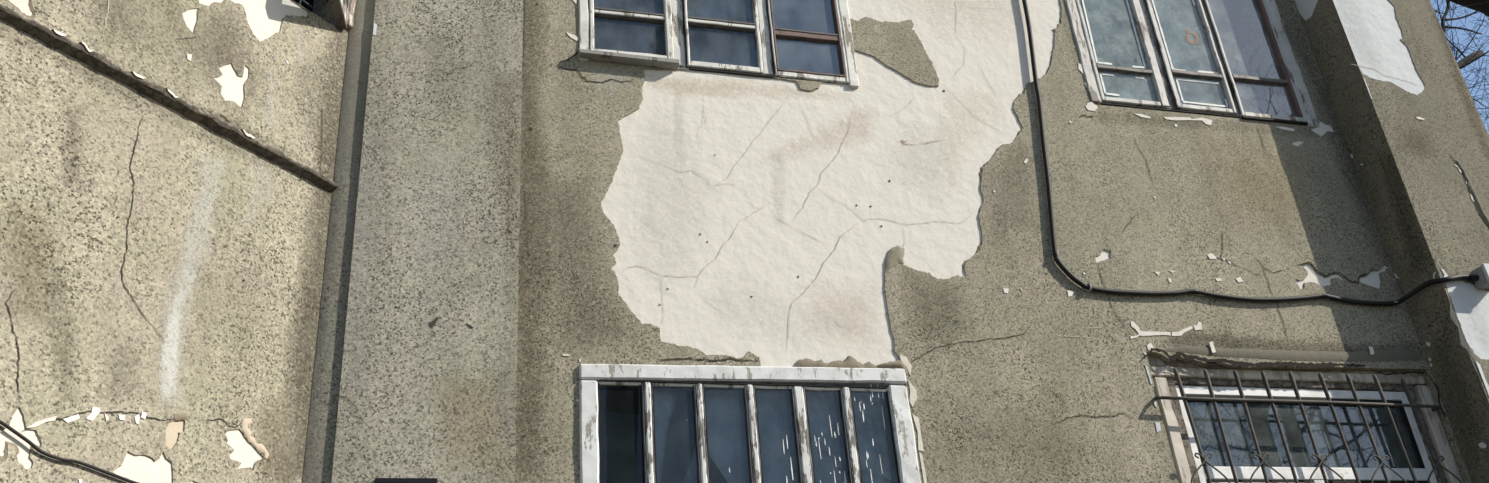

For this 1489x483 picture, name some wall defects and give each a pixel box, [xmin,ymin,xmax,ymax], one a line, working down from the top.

peeling [6,0,36,19]
peeling [214,63,249,107]
peeling [182,0,308,43]
peeling [1294,0,1425,99]
crack [121,114,164,341]
crack [625,105,975,361]
peeling [601,0,1062,483]
peeling [1130,321,1216,432]
peeling [1433,269,1489,396]
peeling [0,407,147,469]
peeling [113,420,184,483]
peeling [226,429,263,469]